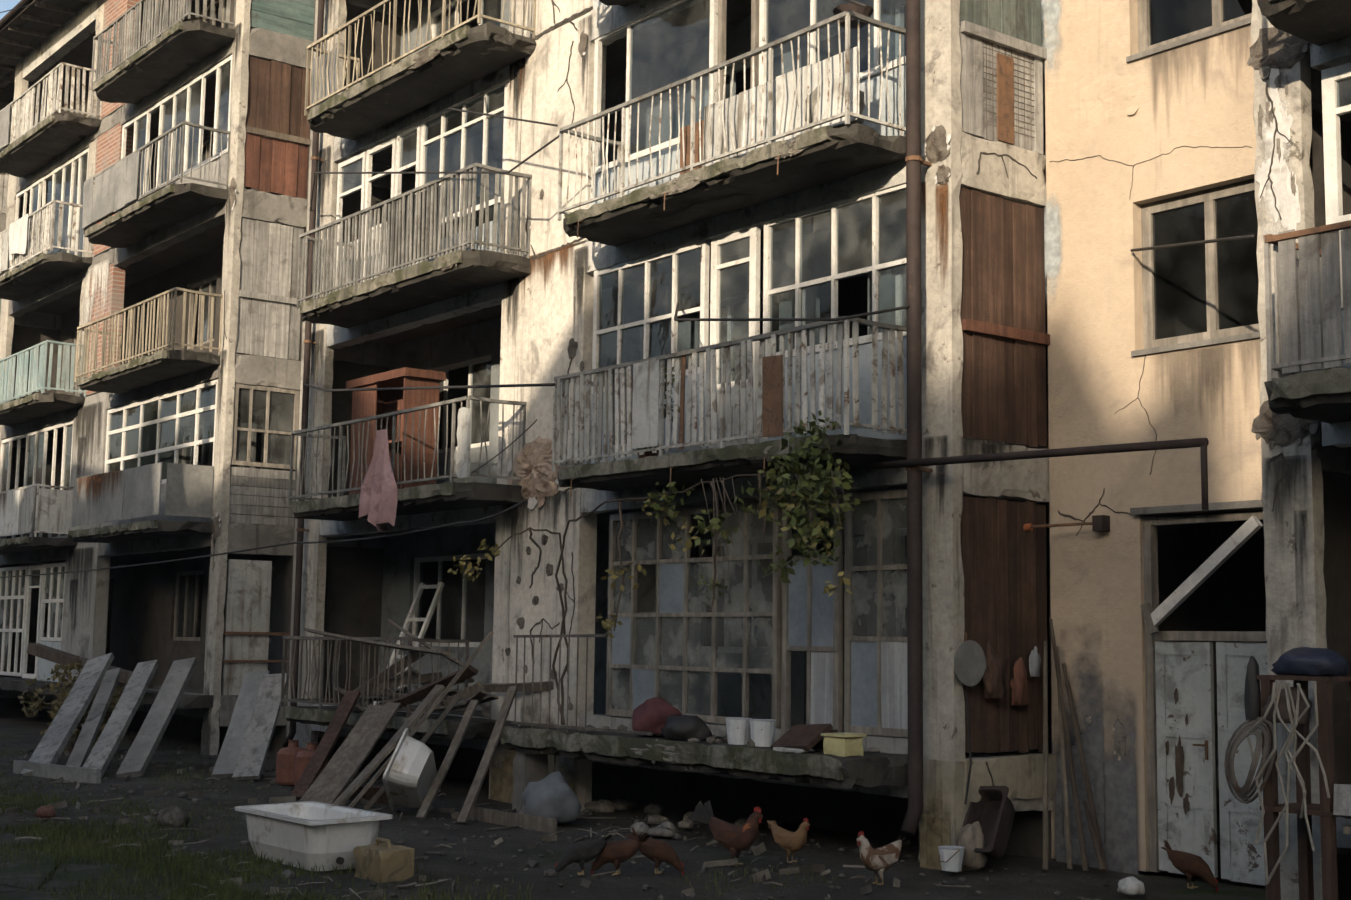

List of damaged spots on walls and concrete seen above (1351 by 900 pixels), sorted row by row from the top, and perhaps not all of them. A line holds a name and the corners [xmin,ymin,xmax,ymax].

crack [531,0,593,138]
crack [976,84,1292,220]
peeling [1247,27,1310,231]
crack [1115,355,1157,474]